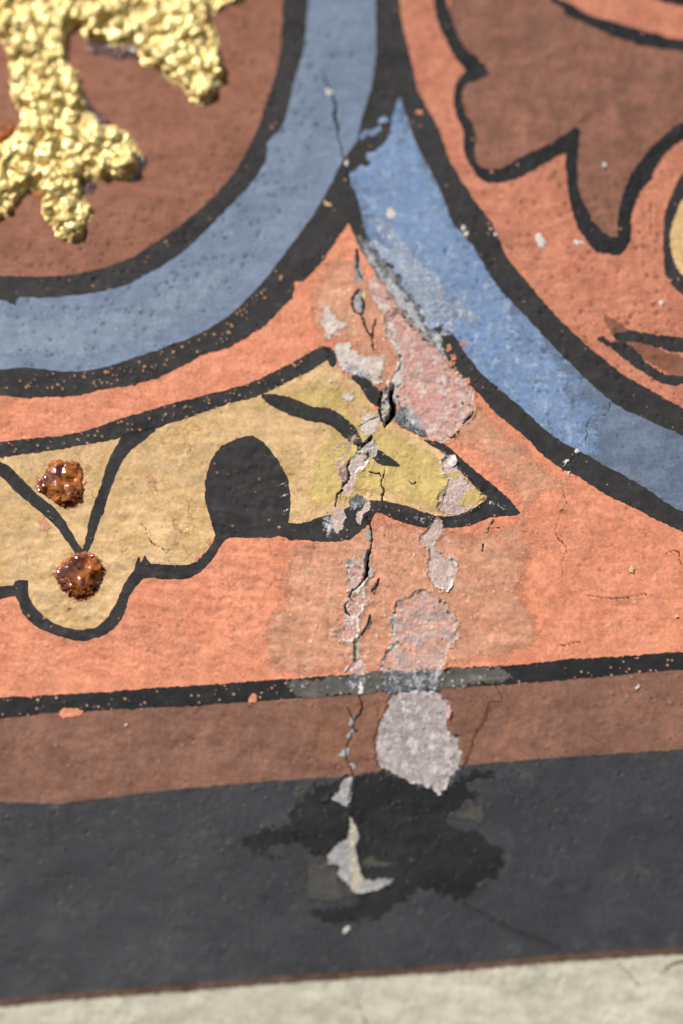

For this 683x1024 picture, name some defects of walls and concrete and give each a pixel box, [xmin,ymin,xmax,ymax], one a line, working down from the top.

crack [312,75,353,204]
crack [351,249,377,351]
peeling [332,529,377,642]
crack [335,387,399,662]
peeling [338,276,484,795]
crack [346,695,363,801]
peeling [327,715,393,893]
leakage [241,768,506,924]